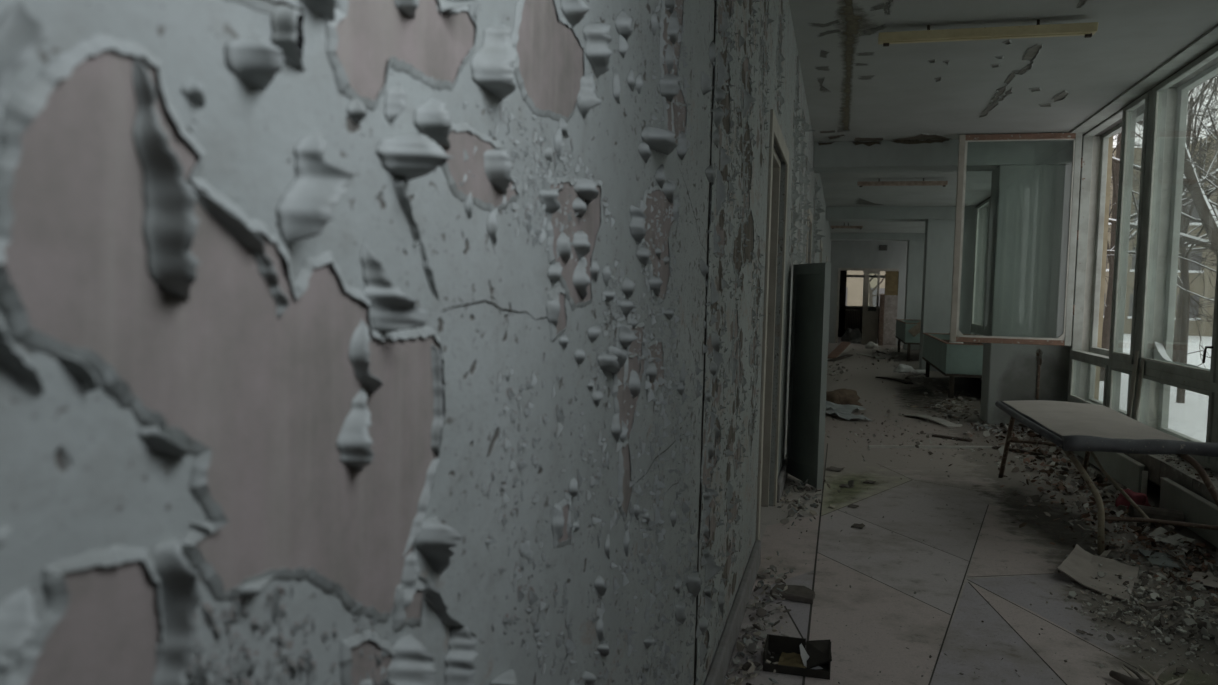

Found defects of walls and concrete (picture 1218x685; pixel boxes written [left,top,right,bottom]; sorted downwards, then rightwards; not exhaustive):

peeling [0,0,479,685]
crack [234,0,304,23]
peeling [225,0,955,685]
spalling [980,39,1070,117]